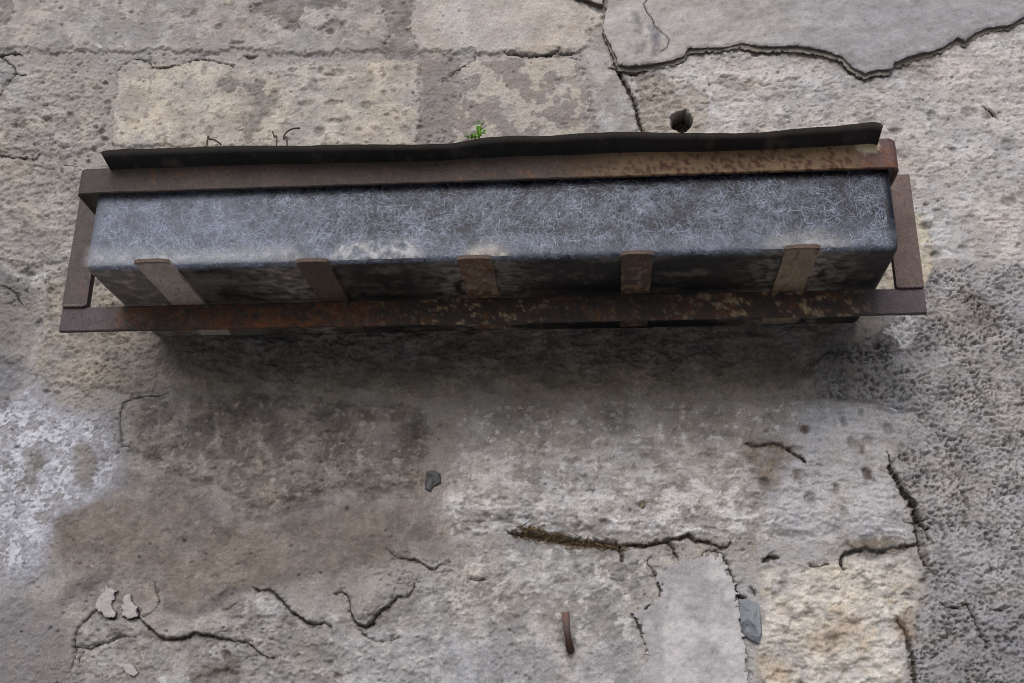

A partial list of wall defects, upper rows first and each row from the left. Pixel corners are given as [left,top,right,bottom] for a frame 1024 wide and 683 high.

crack [611,69,646,132]
leakage [0,367,120,583]
crack [745,443,806,463]
crack [810,452,940,577]
peeling [95,585,140,620]
peeling [122,663,139,676]
crack [73,587,272,664]
crack [255,550,485,642]
crack [509,531,755,600]
crack [762,555,778,563]
crack [897,623,917,683]